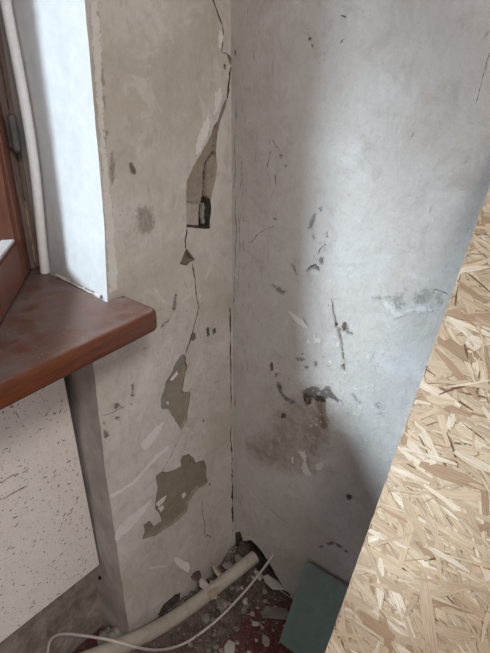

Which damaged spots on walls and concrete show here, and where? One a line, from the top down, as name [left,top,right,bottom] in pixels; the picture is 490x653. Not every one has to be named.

crack [212,0,231,101]
spalling [186,100,227,229]
spalling [180,249,195,265]
crack [186,264,204,352]
crack [229,148,274,402]
spalling [160,354,191,430]
leakage [303,386,341,431]
spalling [142,454,208,539]
crack [228,425,236,531]
spalling [235,531,290,596]